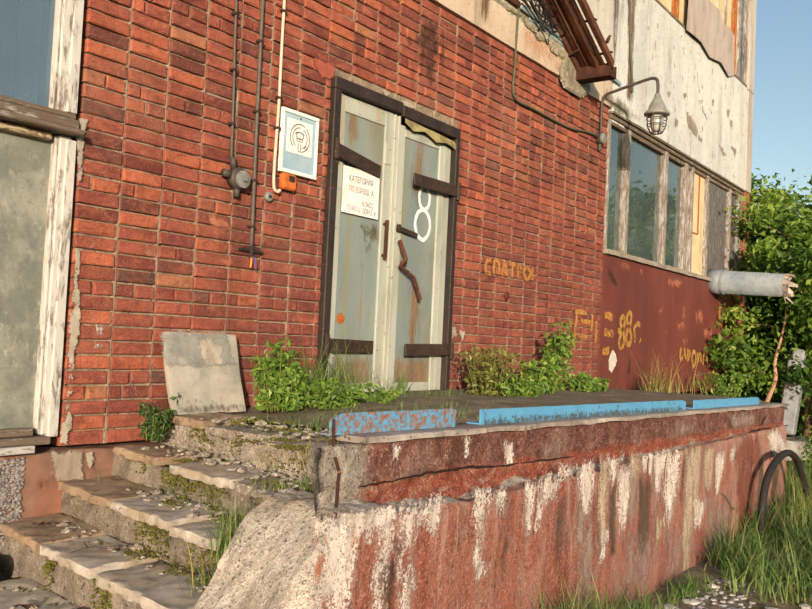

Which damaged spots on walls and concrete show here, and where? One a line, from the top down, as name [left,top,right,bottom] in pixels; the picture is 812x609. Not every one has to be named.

spalling [494,0,591,98]
peeling [51,248,84,481]
water stain [729,412,755,429]
water stain [309,491,445,609]
crack [358,456,574,488]
water stain [471,486,508,580]
water stain [524,429,788,609]